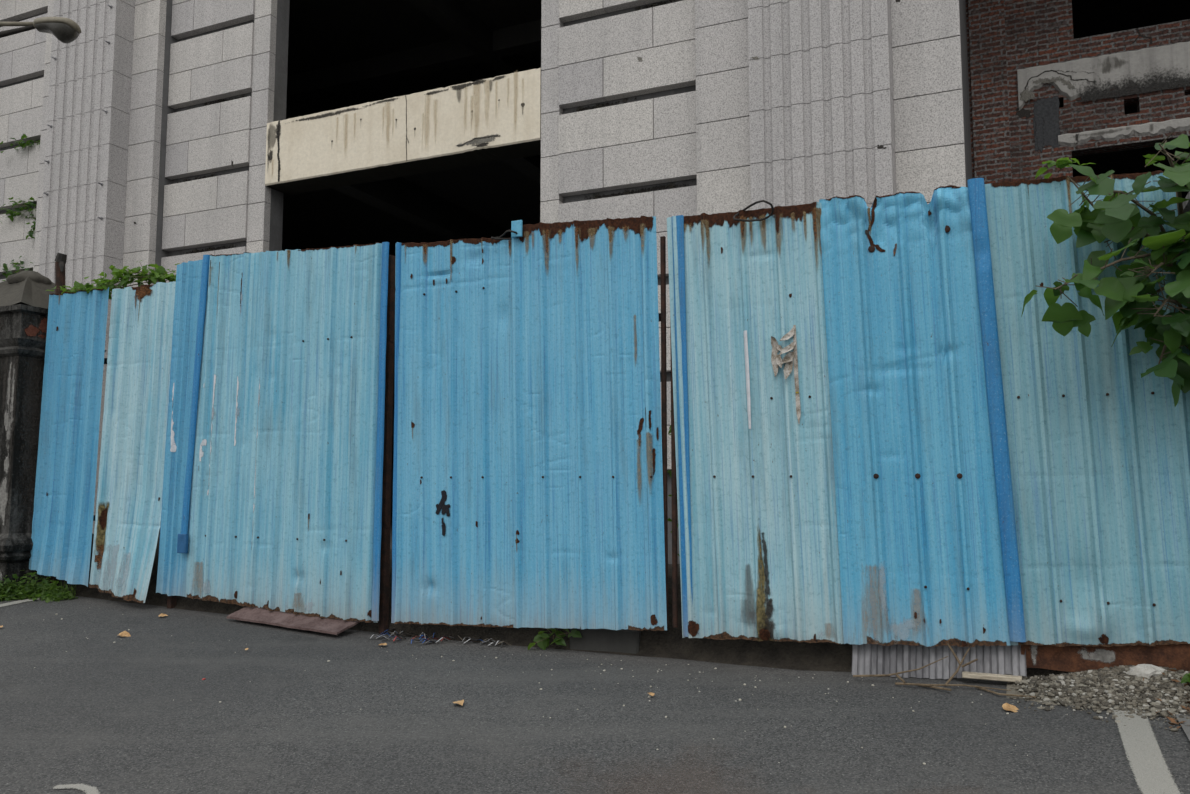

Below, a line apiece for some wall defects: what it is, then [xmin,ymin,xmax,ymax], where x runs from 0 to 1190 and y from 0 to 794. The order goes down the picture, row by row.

leakage [426,75,504,101]
leakage [1077,58,1190,102]
leakage [292,98,398,122]
leakage [267,125,275,163]
corrosion [684,191,920,264]
corrosion [401,216,653,285]
corrosion [94,503,109,569]
corrosion [89,584,143,603]
corrosion [867,627,1188,665]